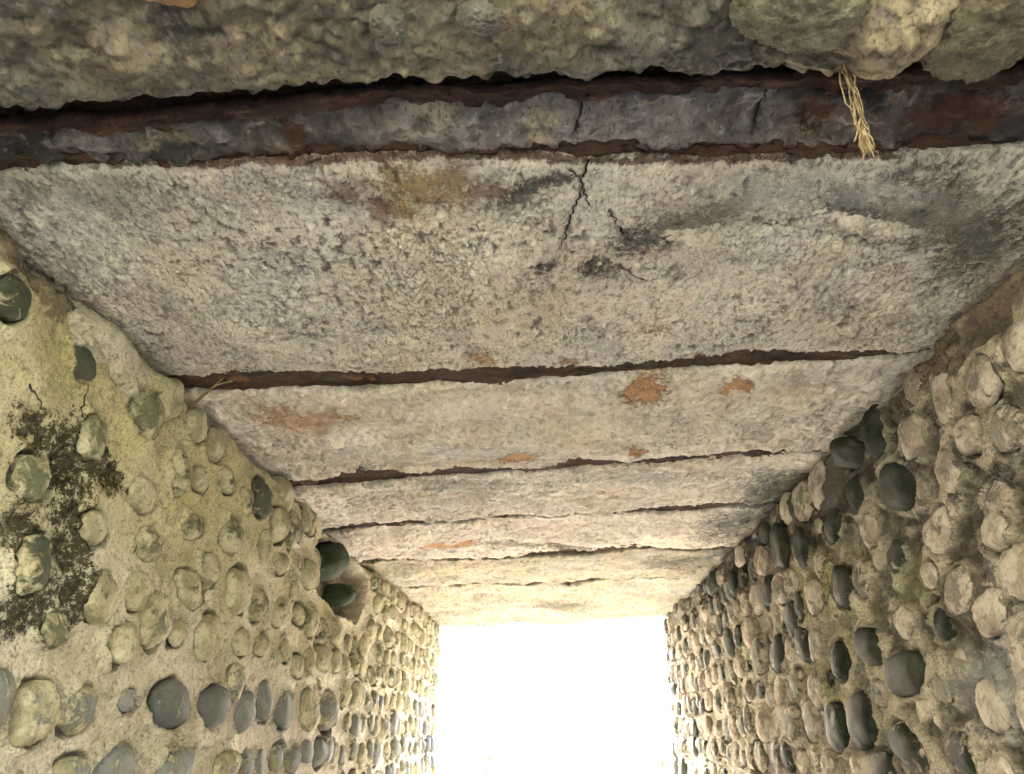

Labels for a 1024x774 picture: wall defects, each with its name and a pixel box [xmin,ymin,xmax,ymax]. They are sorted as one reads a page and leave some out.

crack [559,160,641,248]
corrosion [622,370,671,408]
corrosion [719,378,754,395]
corrosion [499,453,535,463]
corrosion [629,447,649,458]